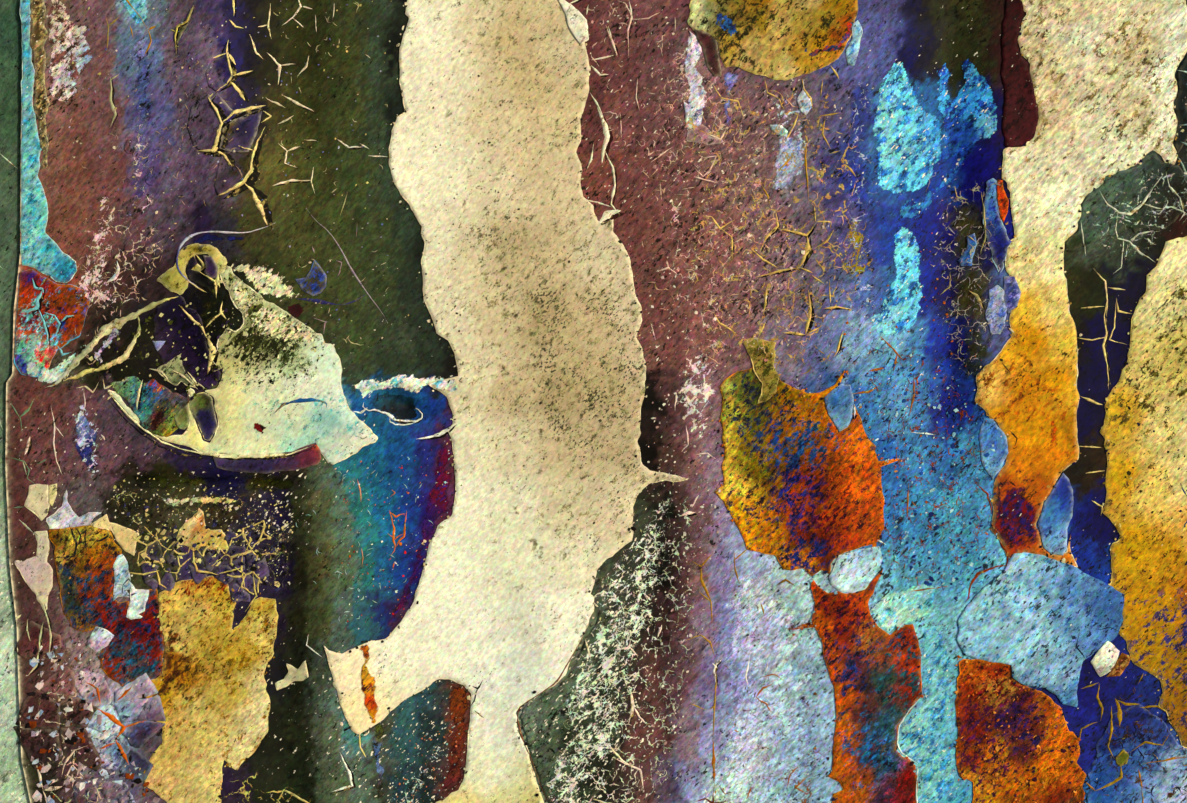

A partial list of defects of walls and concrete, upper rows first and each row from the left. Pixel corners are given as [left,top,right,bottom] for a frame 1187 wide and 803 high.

crack [14,0,387,414]
peeling [295,260,327,296]
peeling [94,328,121,364]
peeling [153,295,221,441]
peeling [324,0,689,803]
peeling [743,338,779,404]
peeling [824,384,854,432]
peeling [871,0,1187,803]
crack [313,511,407,621]
peeling [829,546,883,593]
peeling [13,484,309,803]
crack [226,774,309,803]